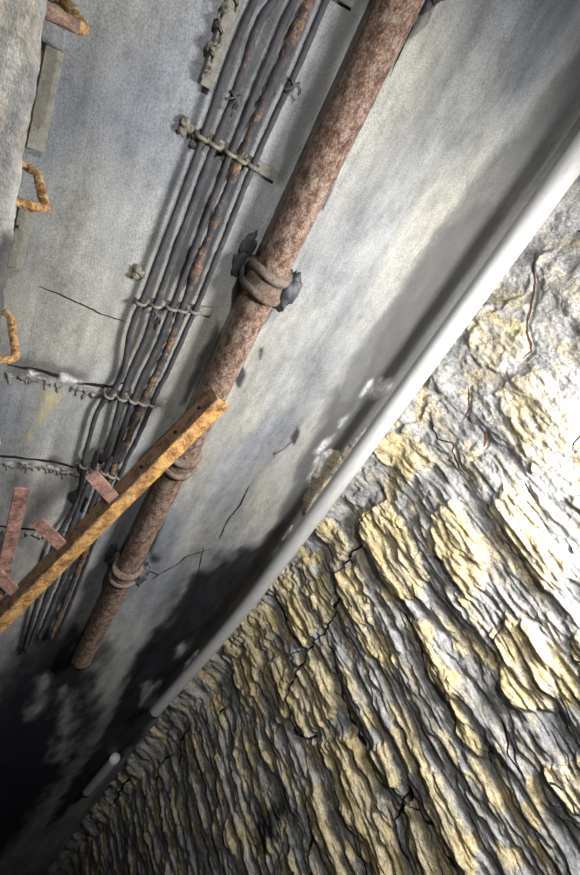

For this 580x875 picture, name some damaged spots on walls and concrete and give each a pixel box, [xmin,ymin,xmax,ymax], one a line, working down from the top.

water stain [0,235,15,322]
crack [40,286,127,323]
water stain [49,62,580,824]
water stain [0,626,106,854]
water stain [258,803,285,853]